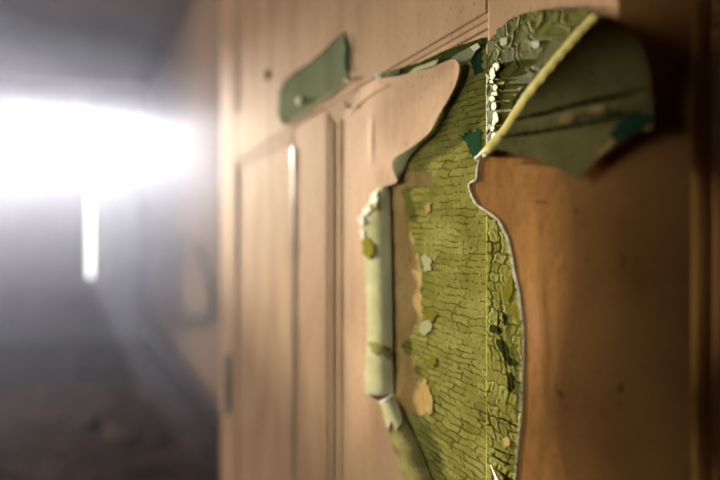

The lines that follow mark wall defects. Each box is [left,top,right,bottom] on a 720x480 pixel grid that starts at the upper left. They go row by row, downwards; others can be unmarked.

spalling [277,32,349,126]
peeling [341,0,693,480]